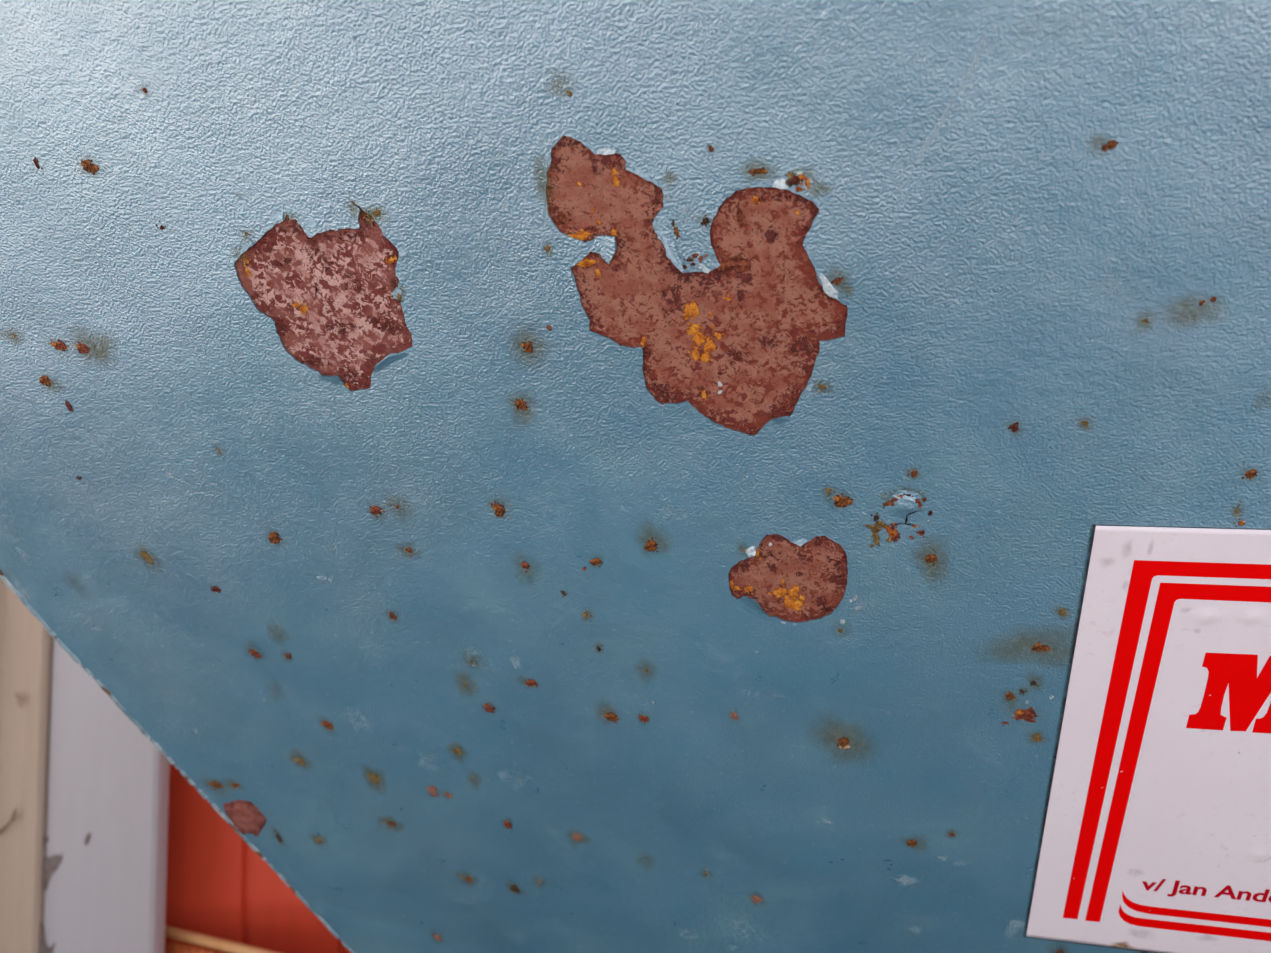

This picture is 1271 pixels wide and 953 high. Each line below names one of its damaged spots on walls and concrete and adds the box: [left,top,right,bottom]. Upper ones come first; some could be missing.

corrosion [546,135,848,435]
spalling [0,575,356,953]
corrosion [834,737,857,750]
corrosion [1001,680,1042,742]